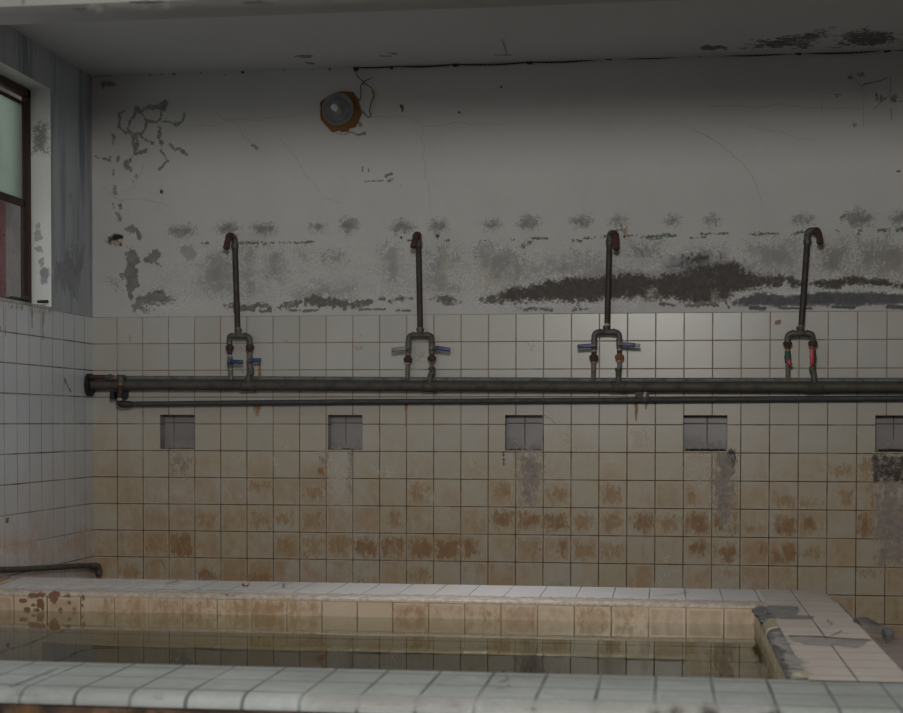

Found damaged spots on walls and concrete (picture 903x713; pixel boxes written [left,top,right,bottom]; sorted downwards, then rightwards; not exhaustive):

flaking render [108,186,176,314]
damp [141,205,903,316]
damp [493,449,738,575]
damp [834,452,903,566]
rust [19,590,85,611]
spalling [752,605,814,624]
peeling [772,632,871,678]